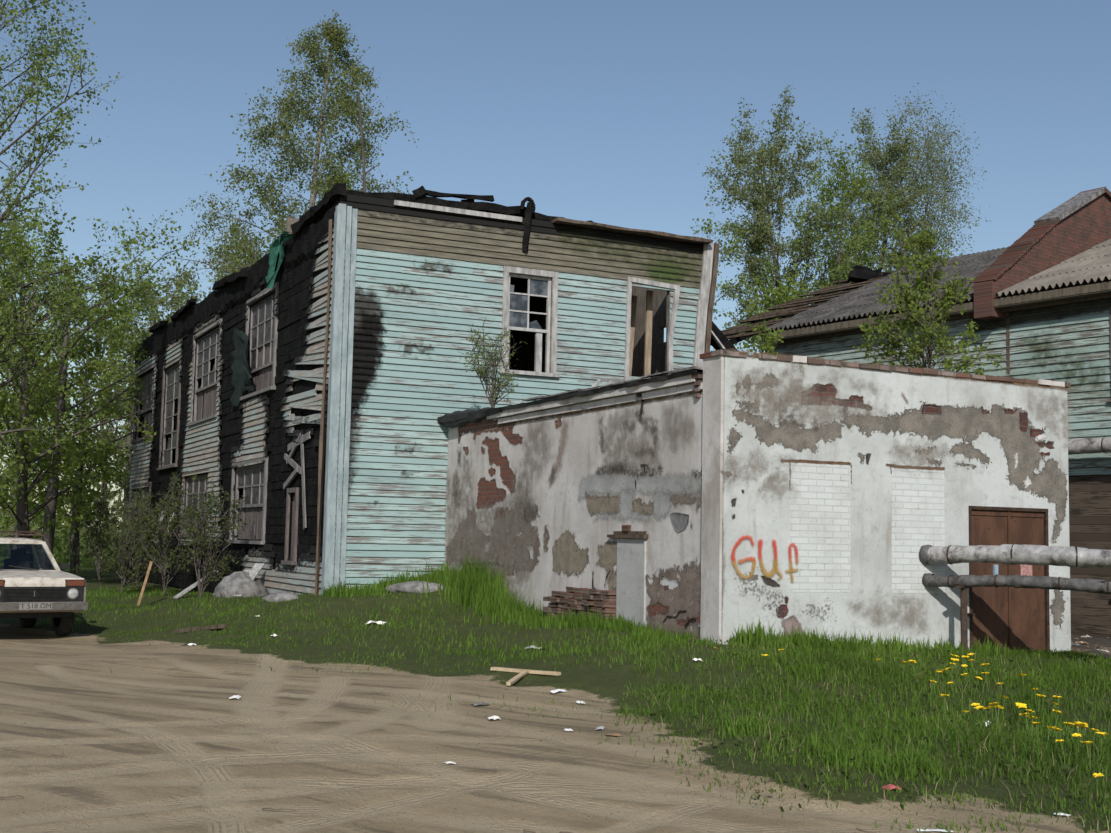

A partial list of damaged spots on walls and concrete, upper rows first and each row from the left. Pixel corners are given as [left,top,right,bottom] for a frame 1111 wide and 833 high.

peeling [727,373,1069,544]
water stain [447,427,547,601]
peeling [446,415,617,591]
peeling [585,489,654,522]
flaking render [670,492,702,532]
peeling [645,560,701,640]
peeling [1050,589,1066,629]